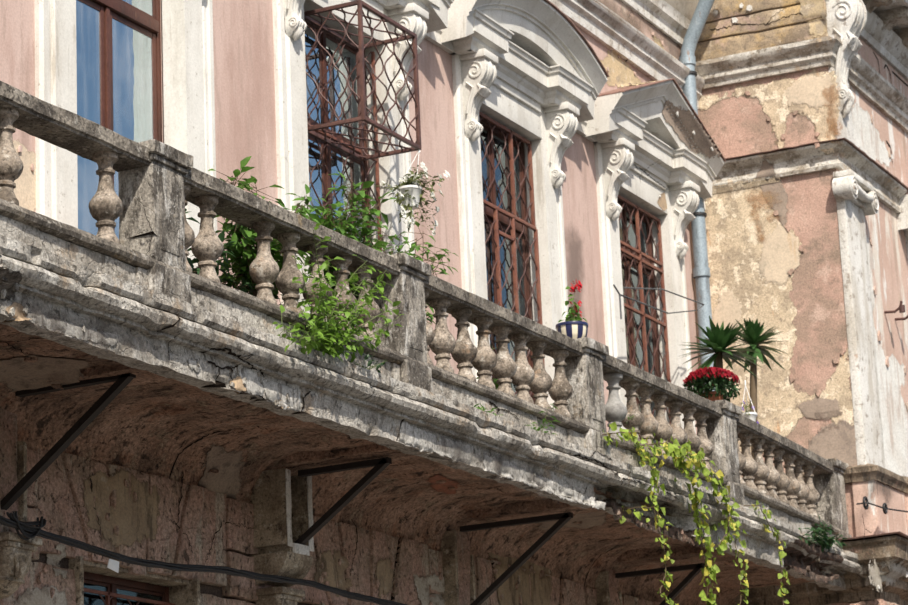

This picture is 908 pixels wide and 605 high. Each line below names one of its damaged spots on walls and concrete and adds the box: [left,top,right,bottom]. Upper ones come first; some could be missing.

crack [710,8,801,31]
flaking render [600,50,662,88]
peeling [662,68,840,159]
peeling [852,102,893,168]
flaking render [0,249,119,346]
peeling [705,176,854,437]
flaking render [0,355,90,392]
peeling [874,327,908,477]
peeling [868,558,908,592]